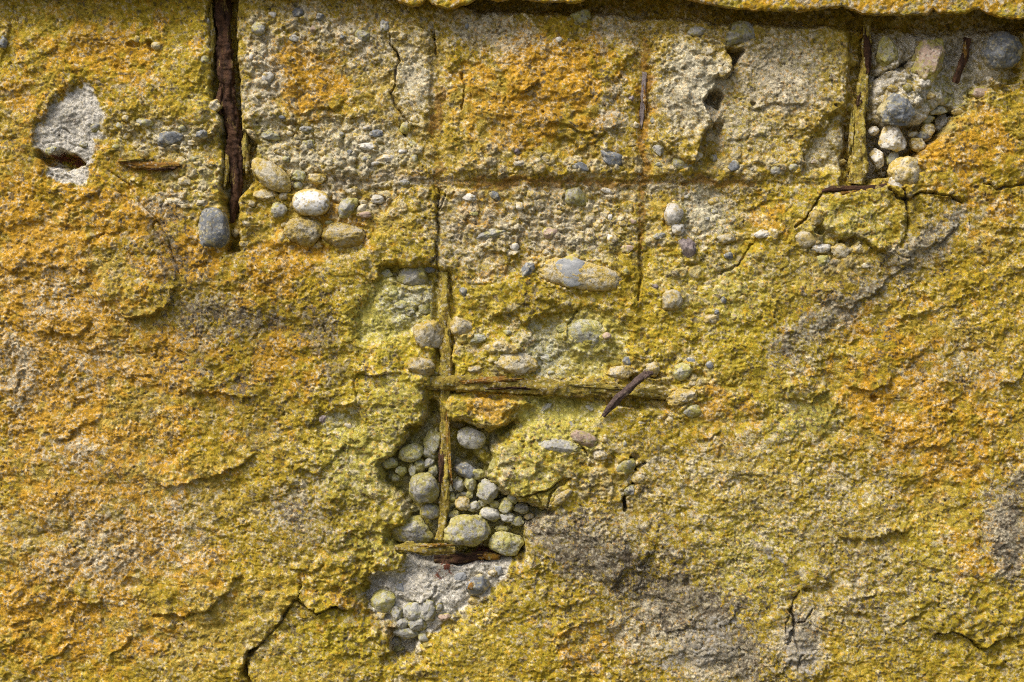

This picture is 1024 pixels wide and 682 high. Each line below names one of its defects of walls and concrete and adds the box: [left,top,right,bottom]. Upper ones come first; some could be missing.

spalling [31,78,213,186]
corrosion [104,158,186,175]
corrosion [208,0,251,223]
corrosion [433,39,661,262]
crack [889,188,909,210]
spalling [859,23,1024,180]
corrosion [952,37,971,84]
spalling [352,262,440,347]
corrosion [395,272,671,579]
spalling [357,395,606,663]